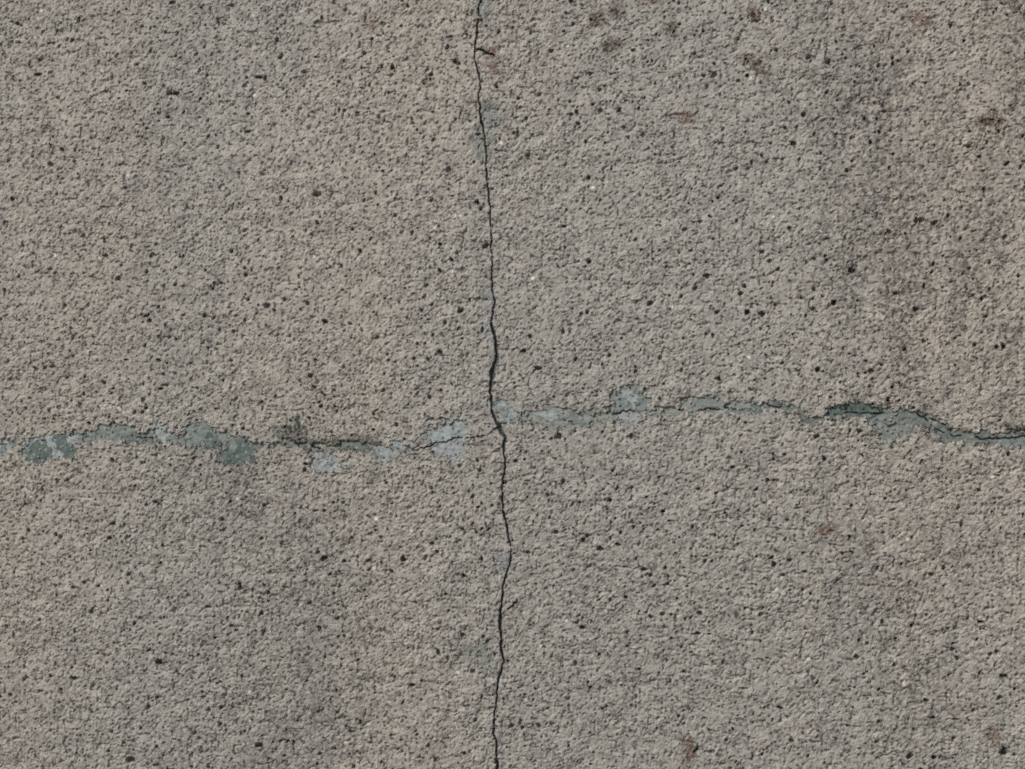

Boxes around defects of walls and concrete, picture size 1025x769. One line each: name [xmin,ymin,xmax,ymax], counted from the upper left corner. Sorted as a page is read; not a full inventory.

crack [0,432,183,448]
peeling [0,418,258,470]
peeling [308,416,472,474]
peeling [487,382,652,429]
crack [215,0,1025,769]
peeling [680,391,769,416]
peeling [828,403,1025,450]